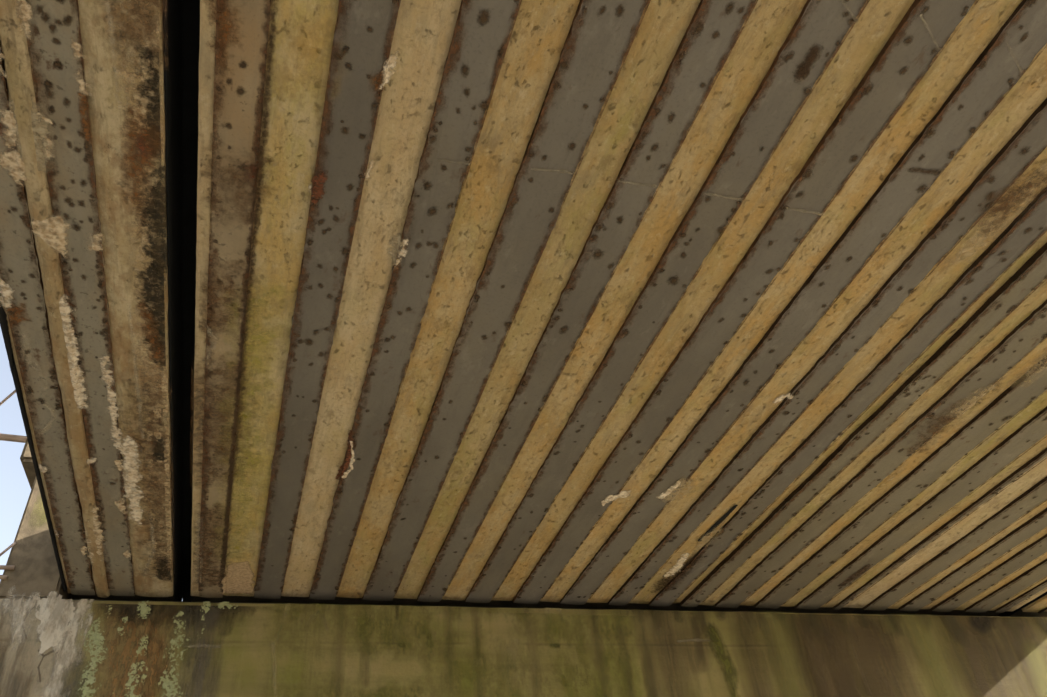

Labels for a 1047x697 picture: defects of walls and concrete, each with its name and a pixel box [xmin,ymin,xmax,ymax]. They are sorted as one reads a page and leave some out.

corrosion [0,175,94,589]
corrosion [21,0,175,590]
damp [106,604,247,697]
corrosion [255,0,401,592]
corrosion [311,0,489,595]
corrosion [365,0,651,594]